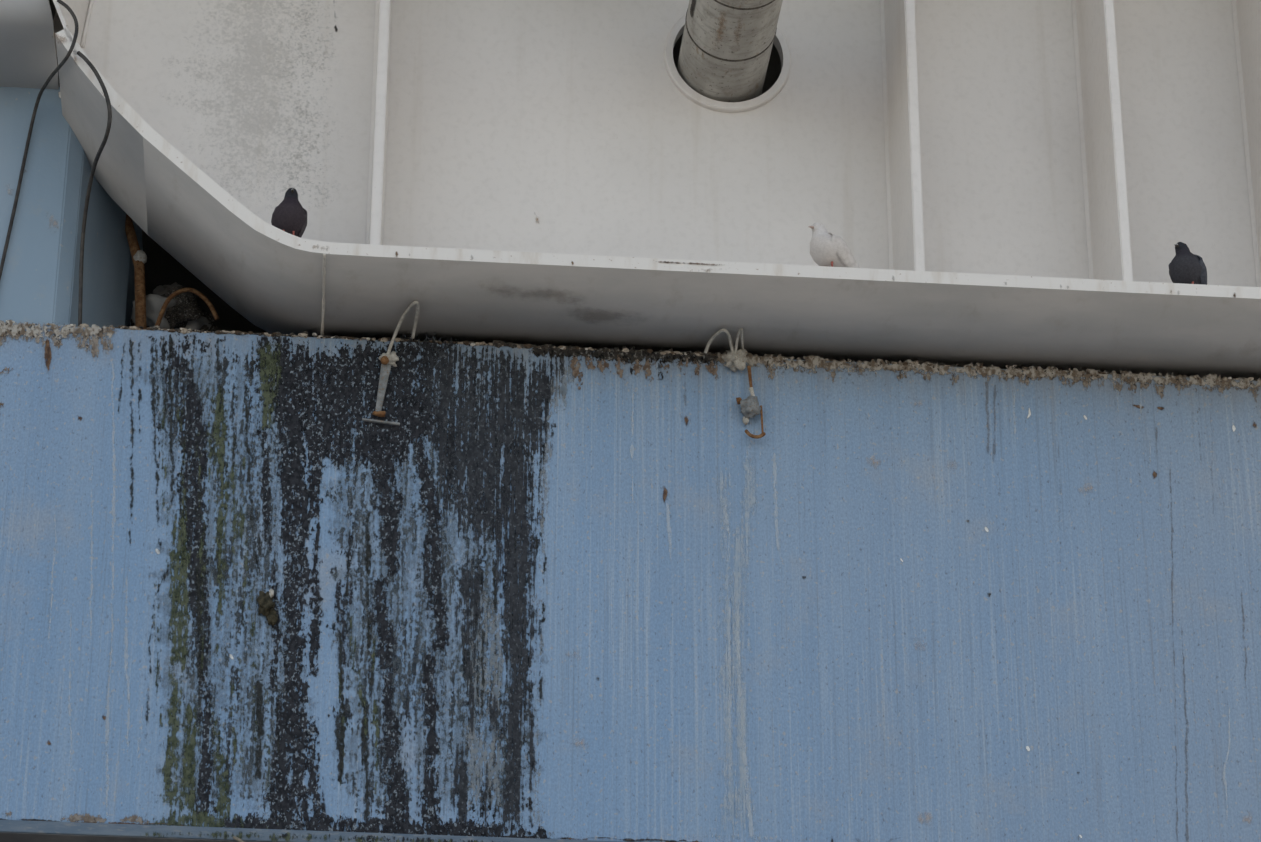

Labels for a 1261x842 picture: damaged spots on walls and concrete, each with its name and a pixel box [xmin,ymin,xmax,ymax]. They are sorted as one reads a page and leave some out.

leakage [118,332,570,839]